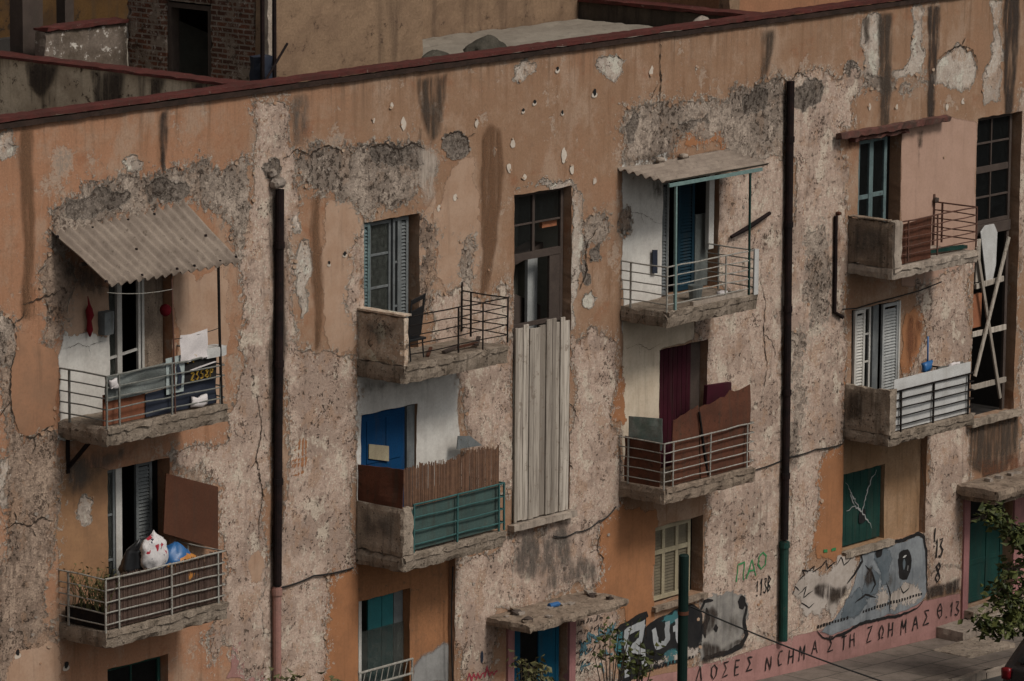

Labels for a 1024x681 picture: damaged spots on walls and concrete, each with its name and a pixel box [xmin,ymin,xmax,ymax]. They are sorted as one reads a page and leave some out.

water stain [20,130,35,317]
water stain [418,76,446,198]
water stain [482,126,504,293]
water stain [865,14,892,125]
water stain [928,6,940,117]
crack [0,291,58,452]
flaking render [0,308,94,681]
crack [250,399,267,530]
flaking render [30,92,514,681]
flaking render [455,148,629,681]
flaking render [613,0,1005,677]